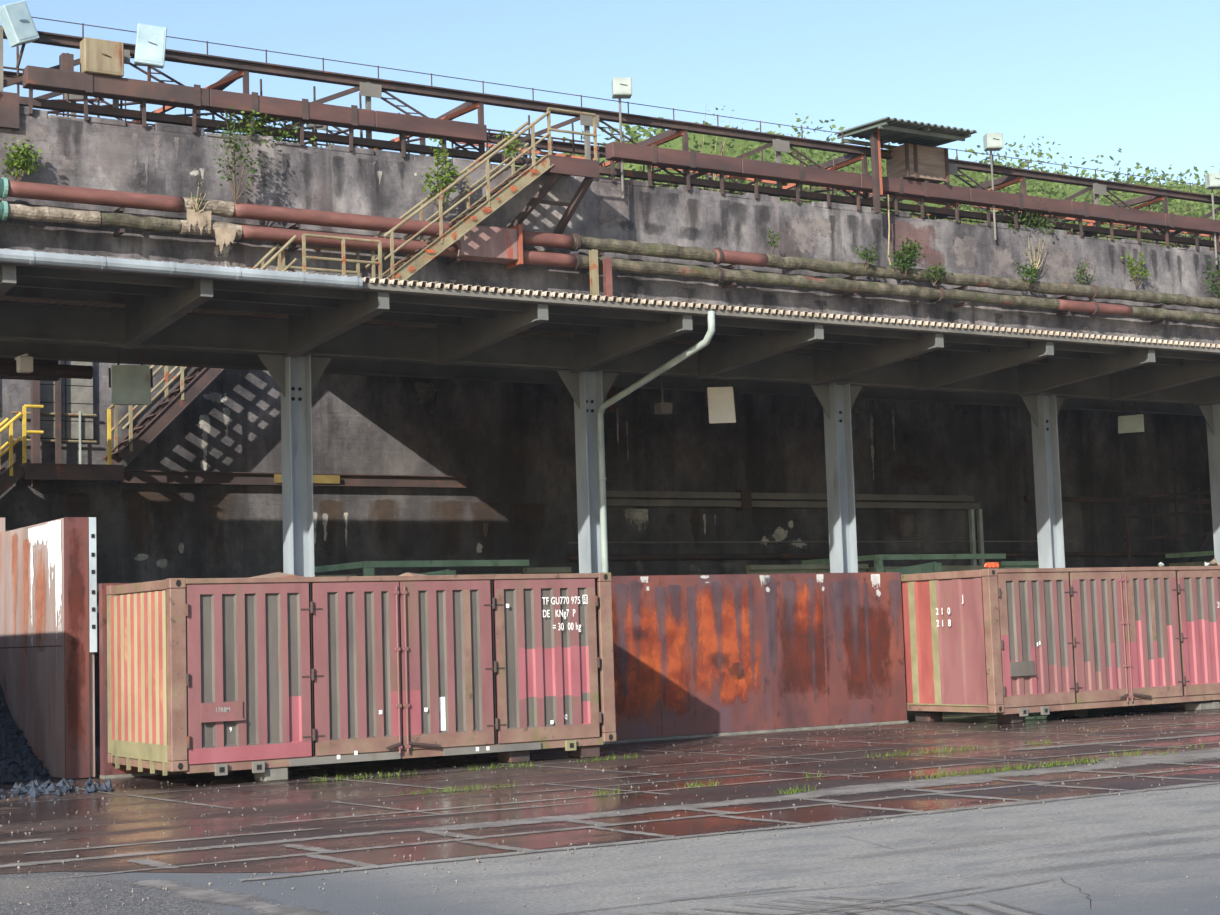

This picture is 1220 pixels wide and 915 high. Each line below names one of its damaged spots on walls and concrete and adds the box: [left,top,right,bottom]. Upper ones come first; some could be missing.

damp [199,391,230,470]
corrosion [12,534,45,642]
corrosion [67,530,85,738]
corrosion [612,587,759,718]